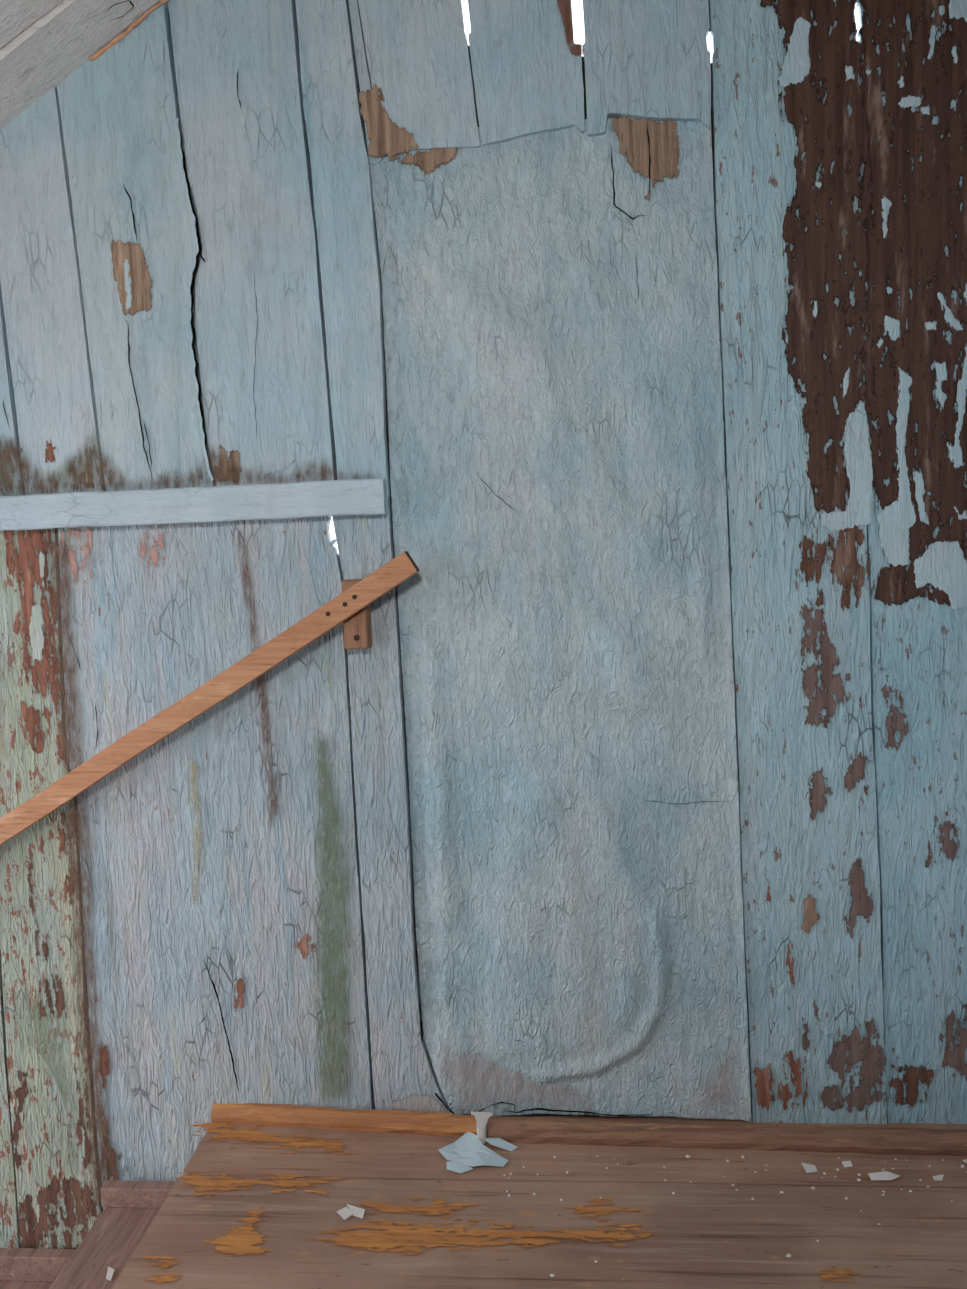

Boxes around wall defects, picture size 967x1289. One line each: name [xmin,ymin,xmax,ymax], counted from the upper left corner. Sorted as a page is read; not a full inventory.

crack [105,0,134,21]
peeling [359,84,461,175]
peeling [610,115,680,200]
peeling [110,240,153,316]
crack [175,118,214,481]
peeling [760,0,967,728]
water stain [0,440,123,494]
water stain [157,452,331,488]
peeling [5,527,93,762]
peeling [807,751,869,823]
peeling [751,1004,967,1113]
peeling [16,1062,130,1249]